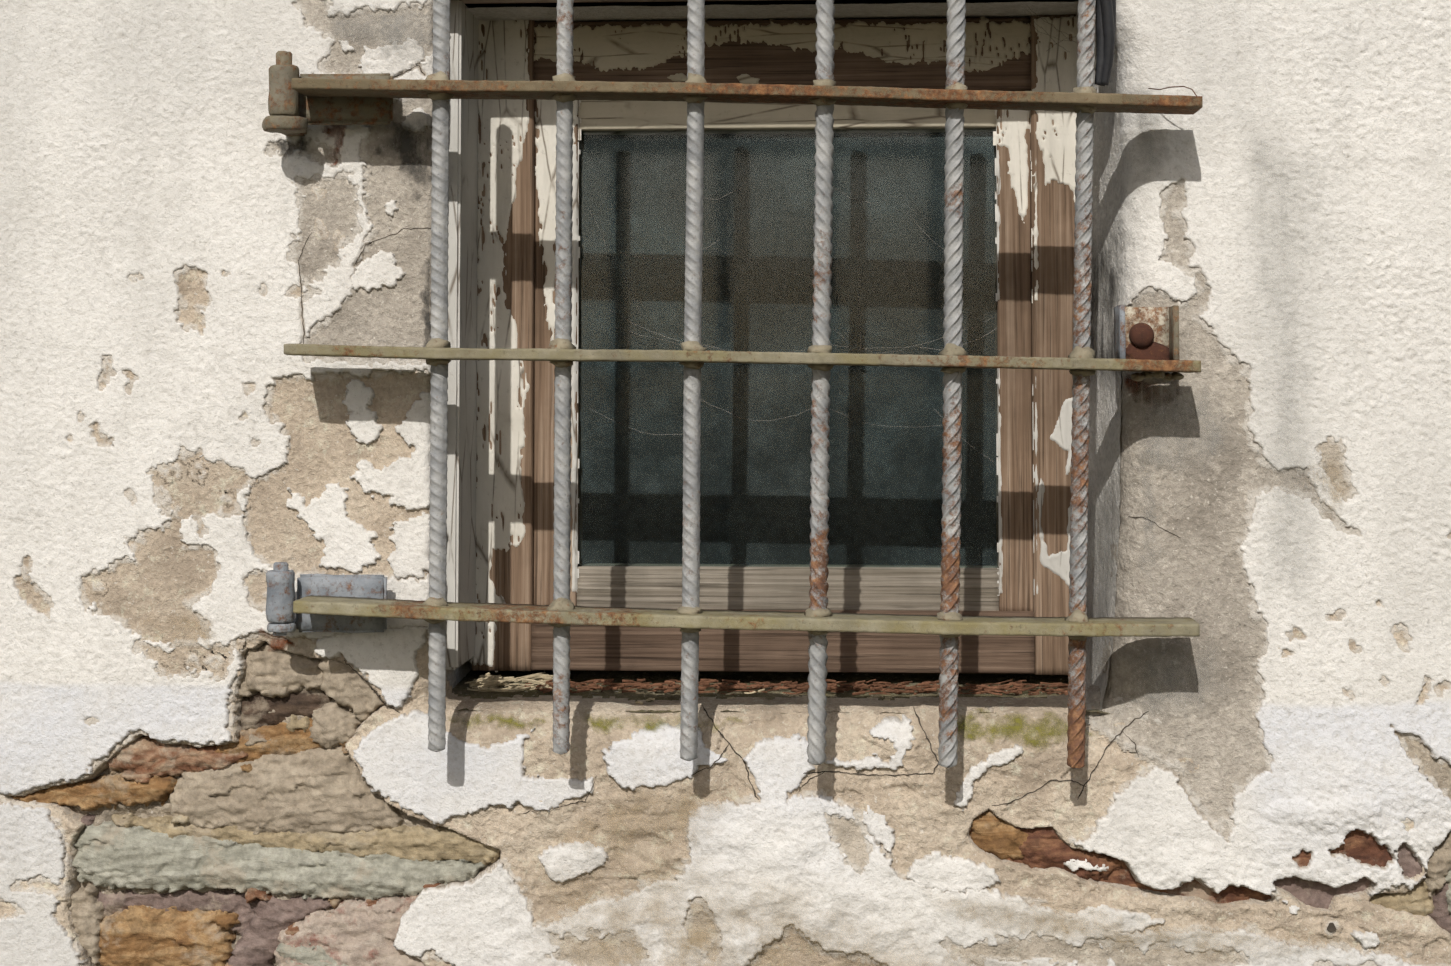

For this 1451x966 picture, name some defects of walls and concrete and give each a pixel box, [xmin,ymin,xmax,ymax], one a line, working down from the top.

peeling [293,0,433,76]
peeling [478,15,1077,92]
peeling [265,98,433,347]
peeling [993,110,1077,303]
peeling [475,99,581,604]
peeling [67,411,114,447]
peeling [14,556,54,619]
spalling [80,179,1451,966]
spalling [0,642,501,966]
crack [691,705,759,800]
crack [800,706,939,788]
crack [992,711,1149,806]